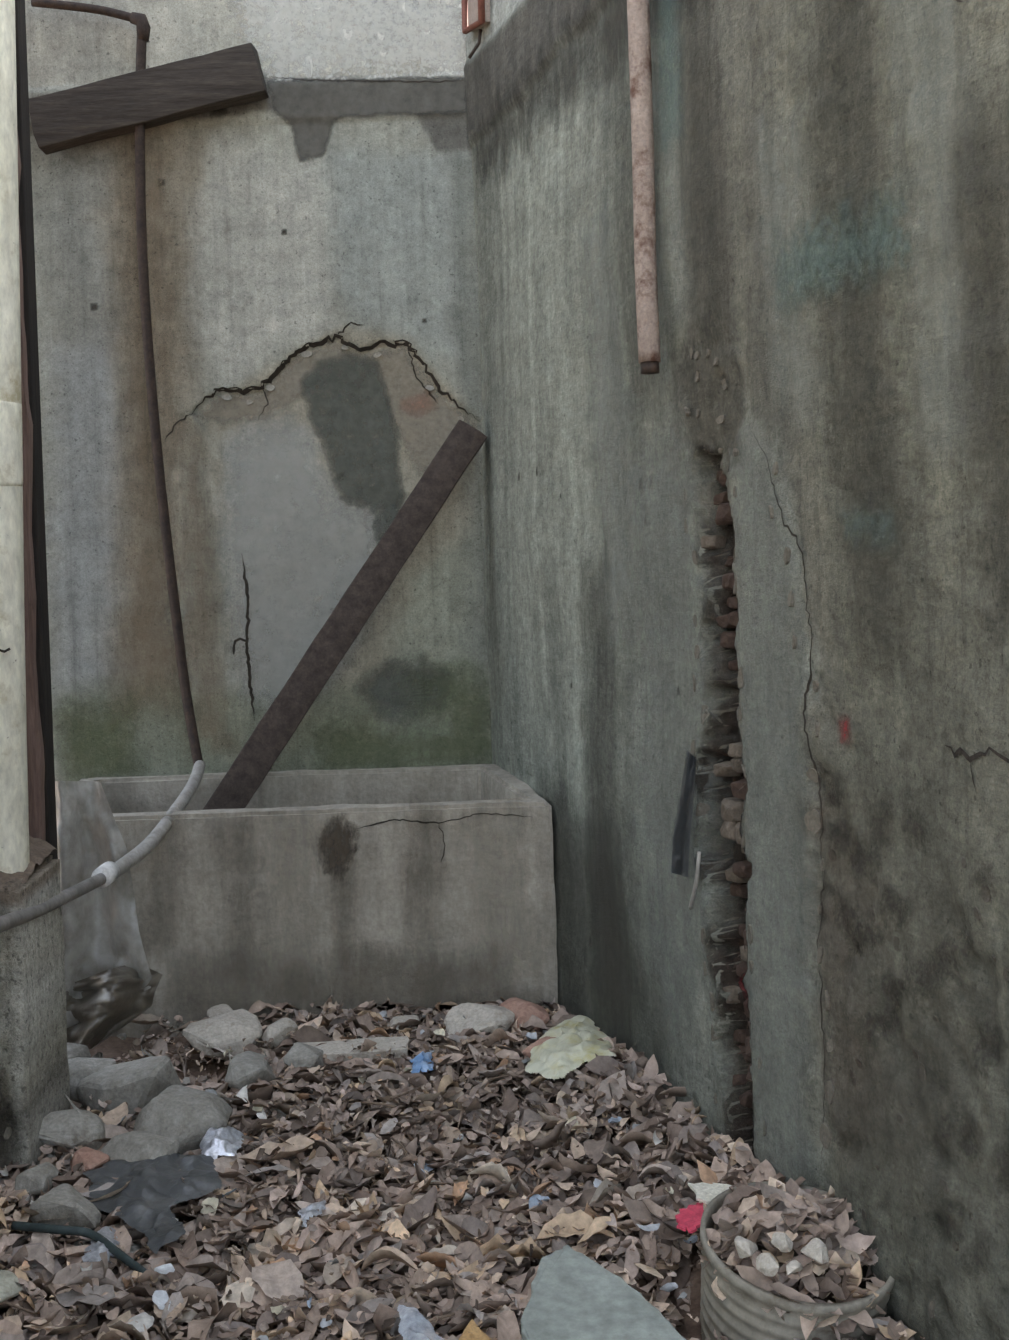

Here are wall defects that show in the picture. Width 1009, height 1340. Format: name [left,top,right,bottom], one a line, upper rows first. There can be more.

flaking render [202,344,473,471]
leakage [302,354,405,541]
crack [232,556,255,720]
leakage [362,662,447,720]
peeling [737,667,745,721]
peeling [746,421,835,1163]
crack [945,745,1009,794]